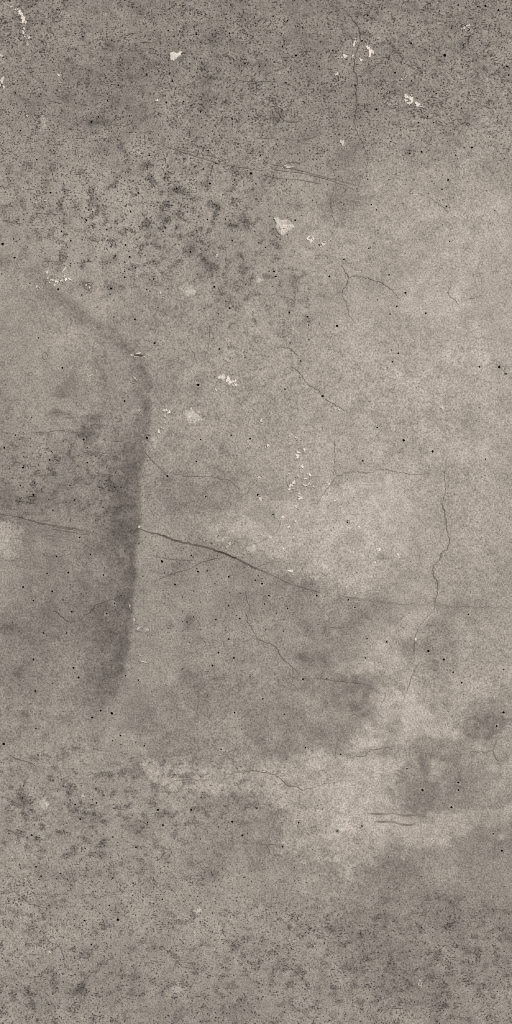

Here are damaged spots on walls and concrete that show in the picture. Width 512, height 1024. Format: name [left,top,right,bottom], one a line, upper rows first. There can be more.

peeling [273,217,294,236]
water stain [0,247,512,1017]
crack [139,440,510,707]